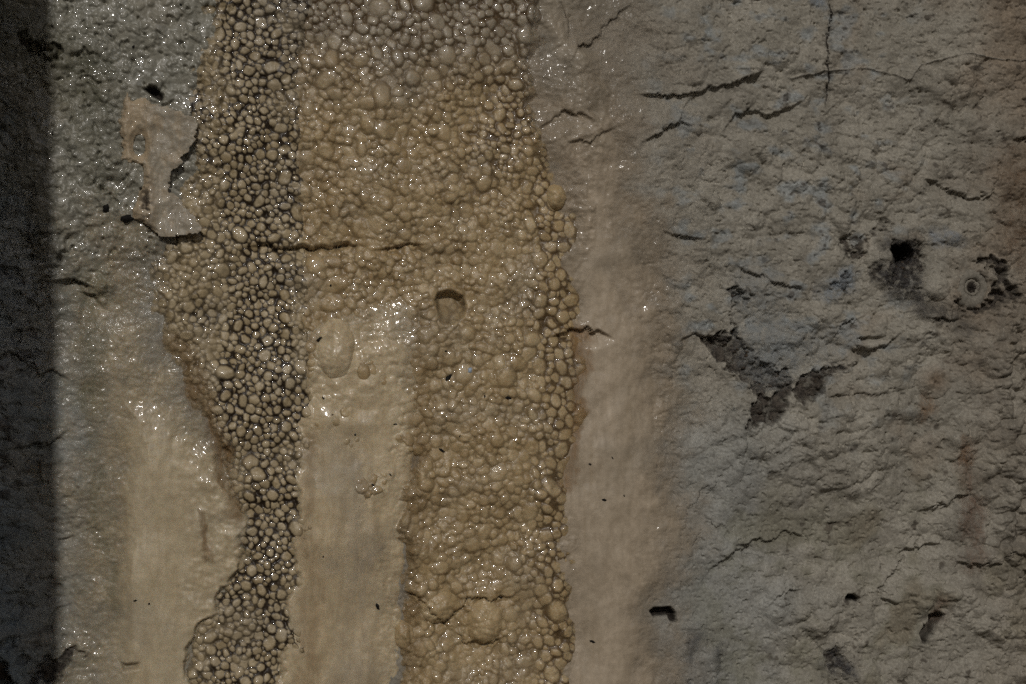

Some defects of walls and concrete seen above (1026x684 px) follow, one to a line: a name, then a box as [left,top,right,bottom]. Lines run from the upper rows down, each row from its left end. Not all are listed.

crack [800,4,1026,104]
peeling [117,93,202,237]
spalling [872,240,924,288]
spalling [954,256,1020,314]
leakage [0,0,690,684]
spalling [700,330,844,428]